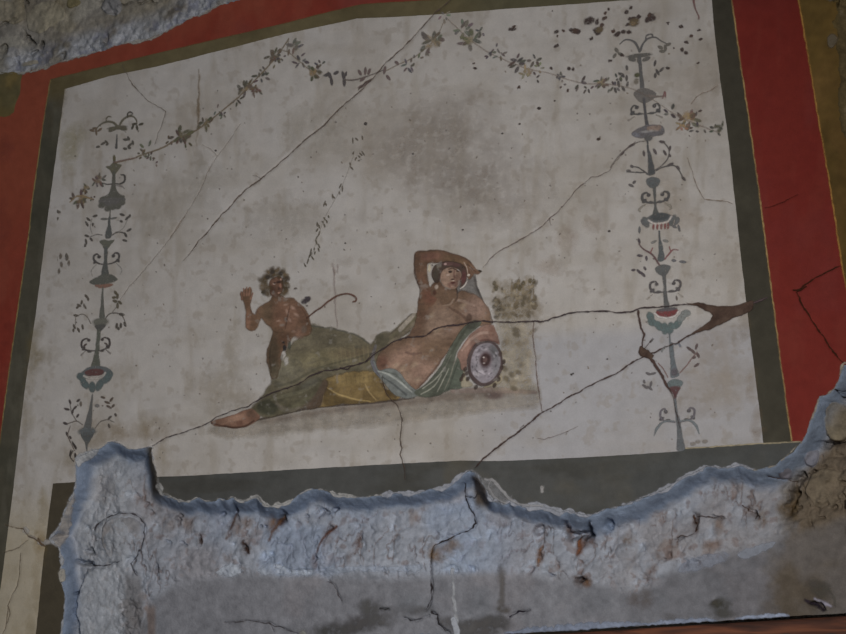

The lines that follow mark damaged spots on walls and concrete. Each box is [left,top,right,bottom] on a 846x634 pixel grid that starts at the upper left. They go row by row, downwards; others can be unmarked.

flaking render [49,362,846,634]